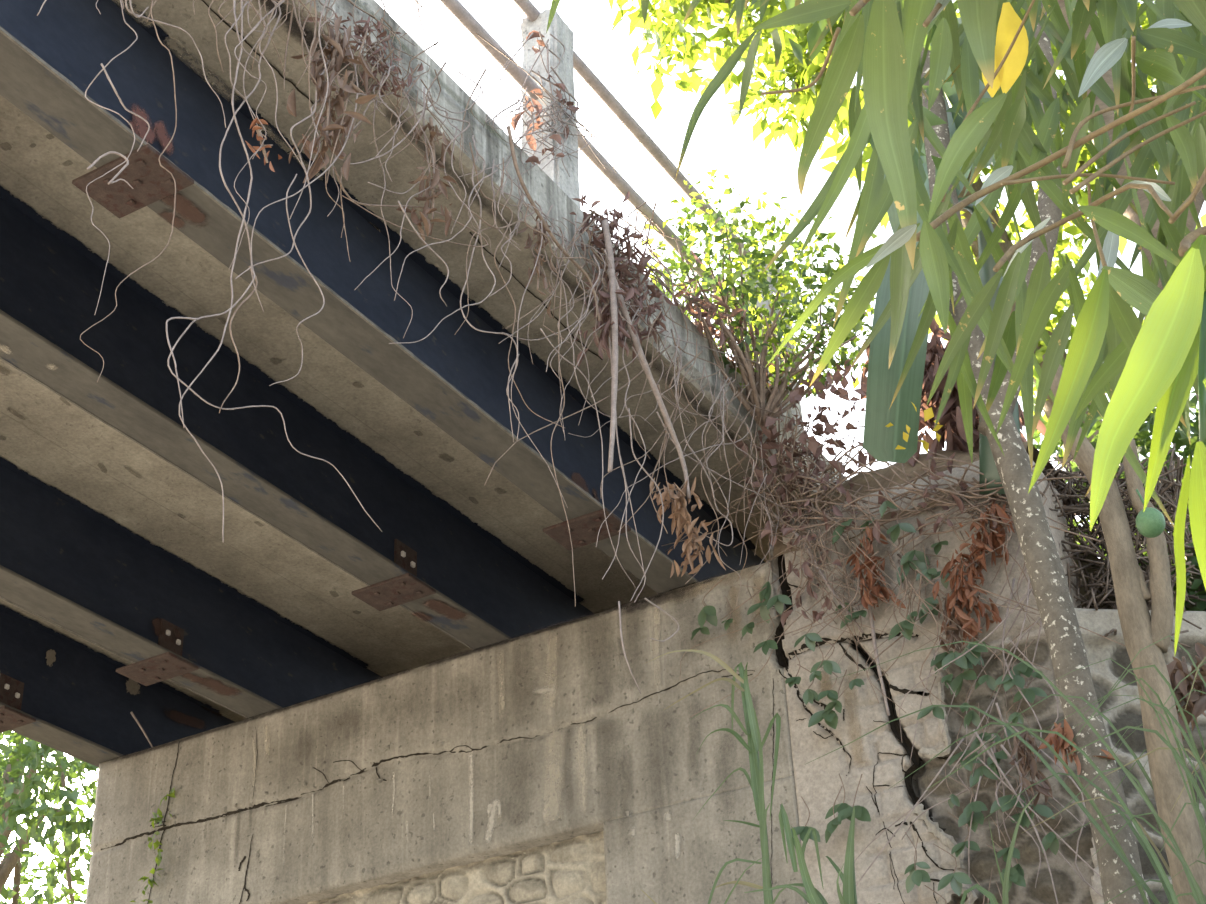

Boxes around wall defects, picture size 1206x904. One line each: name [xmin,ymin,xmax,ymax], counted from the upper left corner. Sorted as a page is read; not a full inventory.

crack [201,0,314,104]
corrosion [130,106,174,153]
corrosion [159,193,206,228]
peeling [45,649,56,667]
leakage [429,579,712,710]
leakage [116,671,405,777]
crack [101,554,954,904]